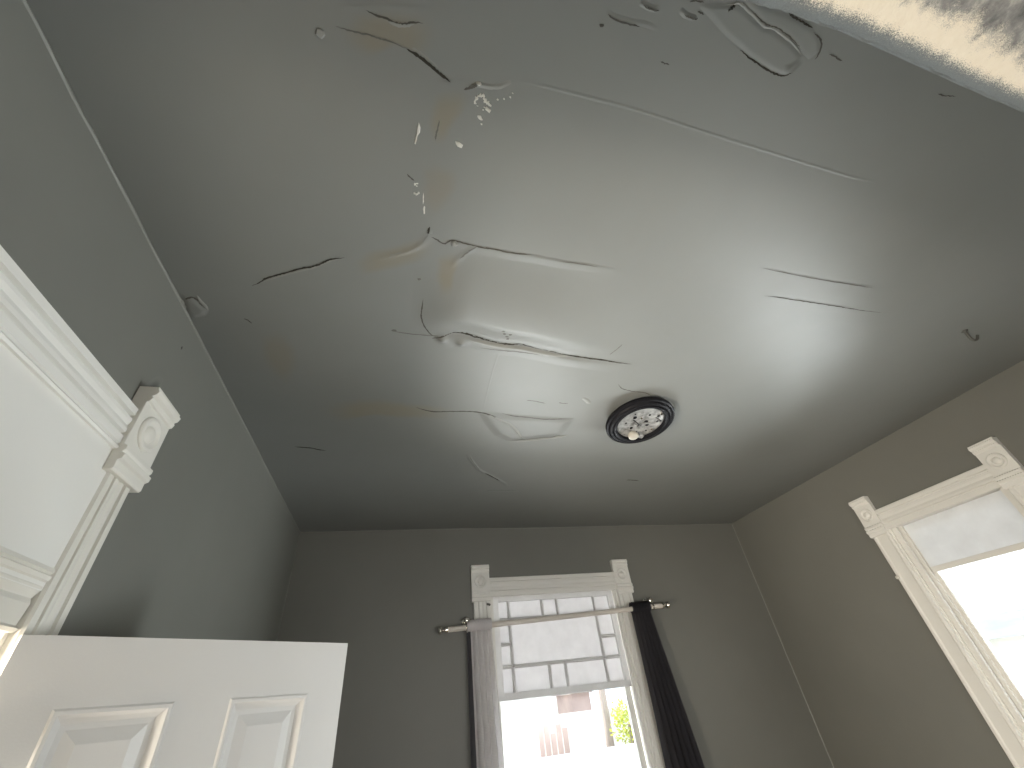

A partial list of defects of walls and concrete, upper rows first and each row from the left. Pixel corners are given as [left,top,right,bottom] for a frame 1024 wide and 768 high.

crack [336,10,511,90]
peeling [474,92,513,125]
crack [252,258,341,286]
crack [764,268,880,313]